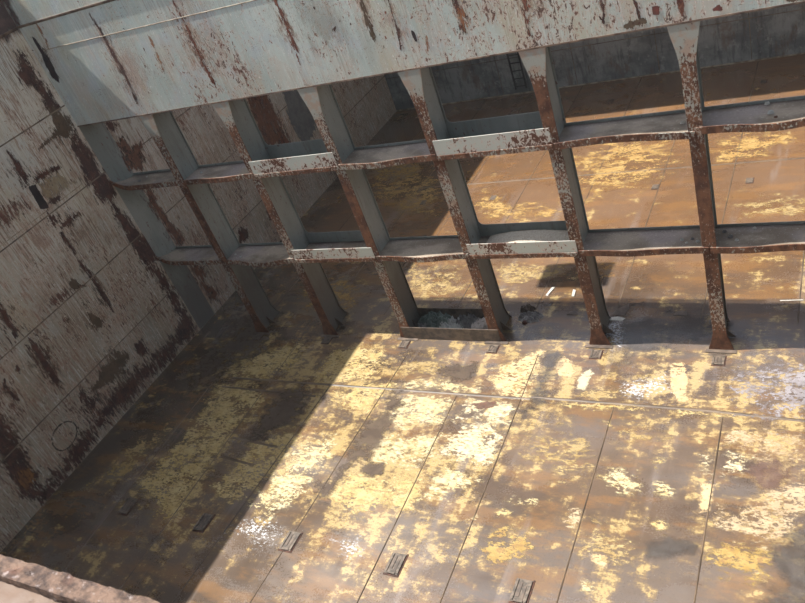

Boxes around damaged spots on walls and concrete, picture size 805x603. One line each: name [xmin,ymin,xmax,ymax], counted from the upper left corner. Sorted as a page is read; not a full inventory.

corrosion [0,0,20,41]
corrosion [89,12,140,104]
corrosion [172,0,215,87]
corrosion [274,0,301,65]
corrosion [360,0,376,42]
corrosion [623,0,647,29]
corrosion [247,95,293,145]
corrosion [0,49,196,340]
corrosion [0,302,65,391]
leakage [620,376,673,399]
leakage [730,363,805,420]
corrosion [0,415,47,501]